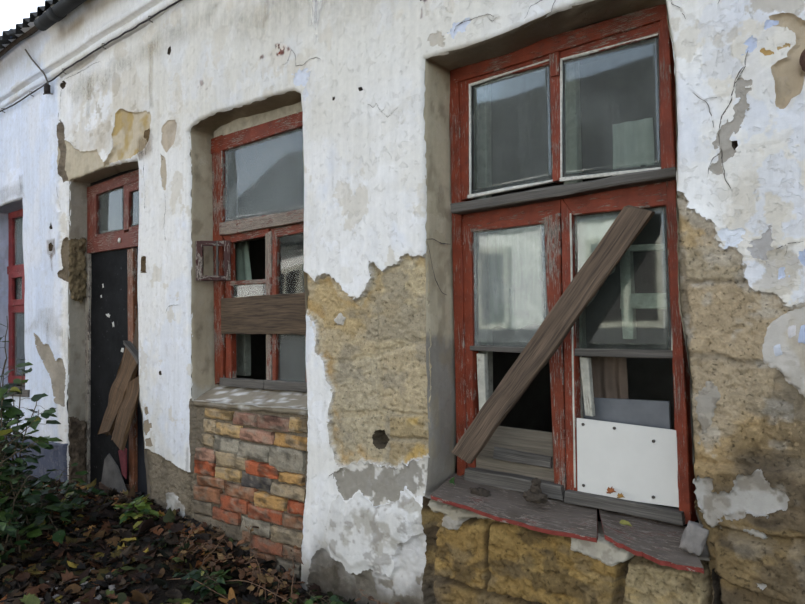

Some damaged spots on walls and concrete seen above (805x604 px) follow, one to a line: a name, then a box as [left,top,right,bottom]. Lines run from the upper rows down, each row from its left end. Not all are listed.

flaking render [742,12,805,109]
flaking render [56,109,151,183]
flaking render [160,120,177,190]
crack [696,51,748,189]
flaking render [57,237,88,303]
flaking render [34,333,66,407]
flaking render [305,253,494,530]
flaking render [677,191,805,604]
flaking render [306,532,427,604]